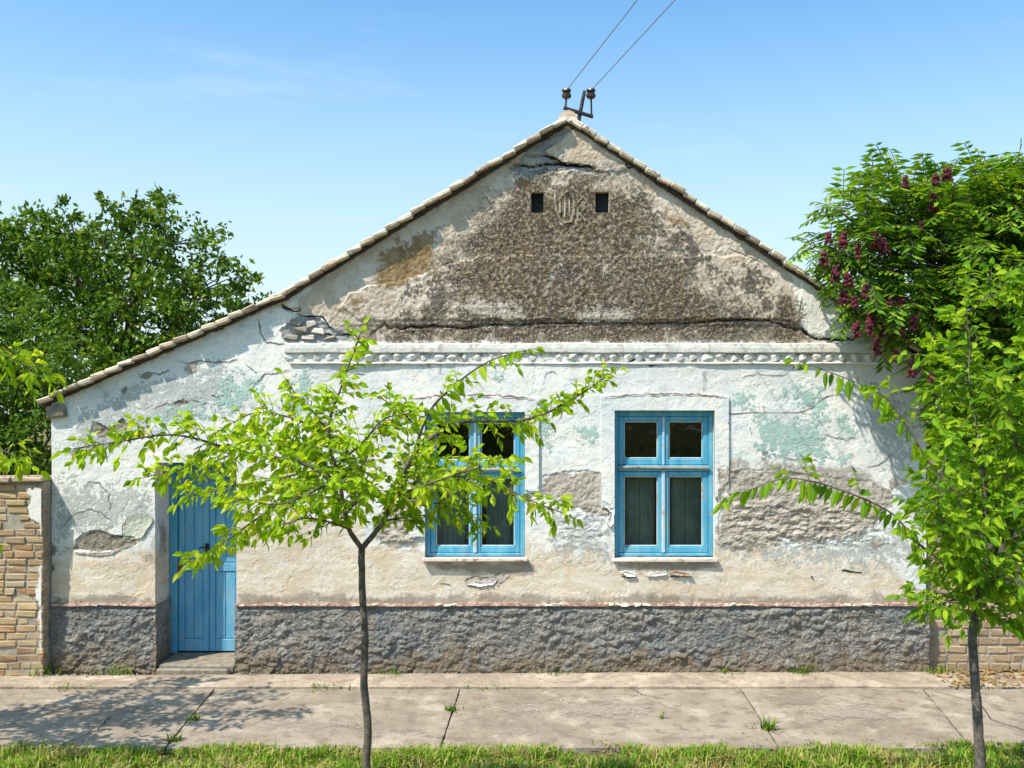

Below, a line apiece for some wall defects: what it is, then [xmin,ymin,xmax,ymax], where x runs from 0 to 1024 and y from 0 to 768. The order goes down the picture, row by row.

crack [514,155,632,171]
damp [671,222,703,269]
damp [747,264,774,285]
crack [376,319,855,341]
crack [177,359,290,388]
peeling [608,372,919,489]
peeling [718,466,730,504]
peeling [51,471,155,572]
peeling [541,470,692,578]
peeling [722,521,921,574]
flaking render [465,570,509,589]